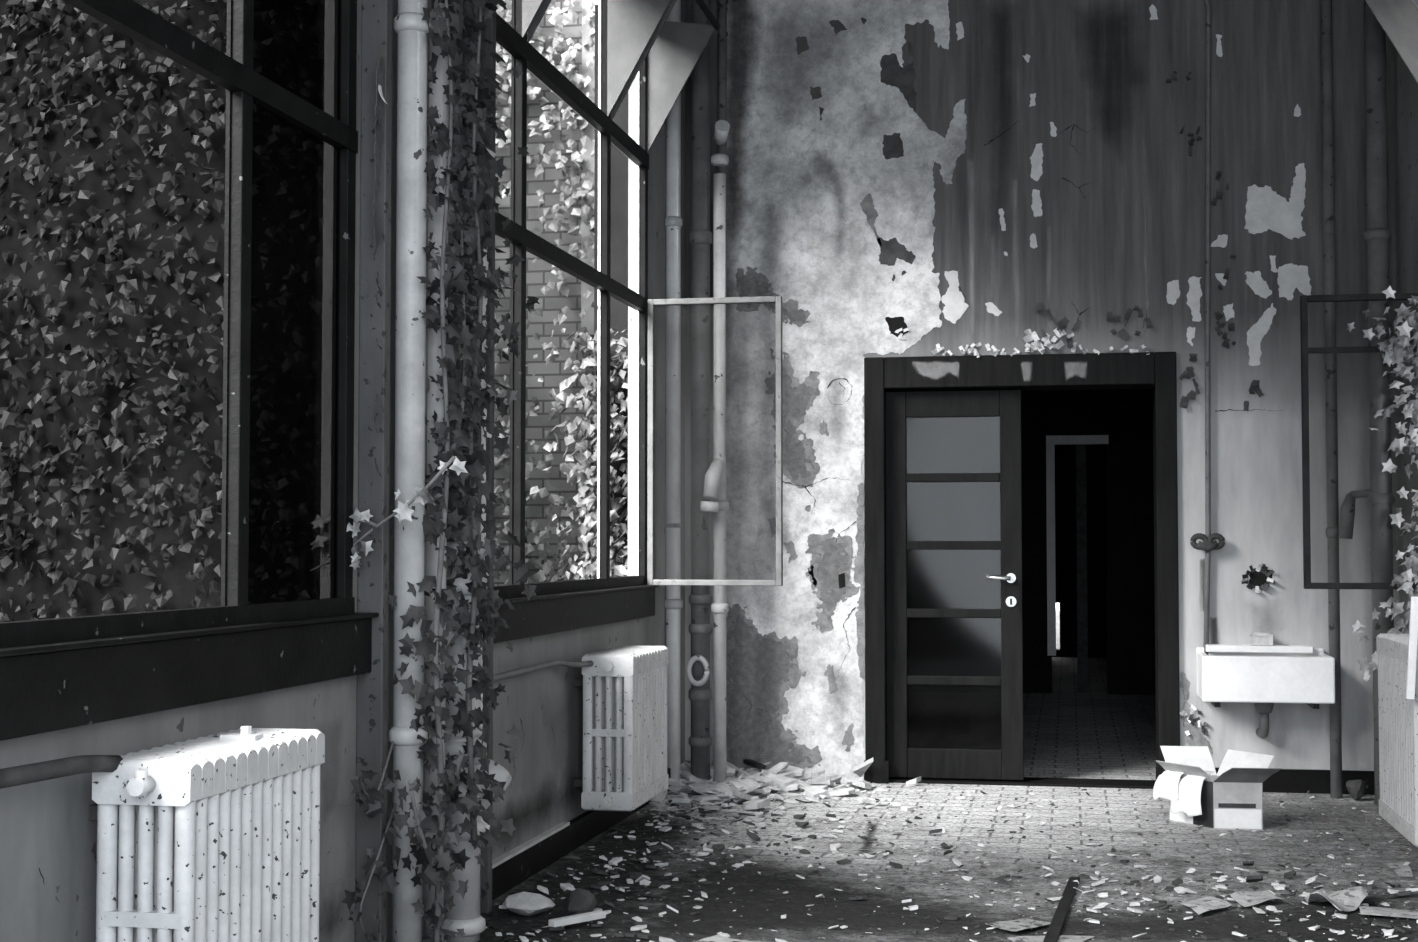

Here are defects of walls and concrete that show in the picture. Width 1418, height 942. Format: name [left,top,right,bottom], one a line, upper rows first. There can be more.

peeling [1244,163,1306,239]
peeling [1166,234,1311,411]
flaking render [712,0,1153,778]
spalling [1241,563,1275,593]
flaking render [1180,672,1213,754]